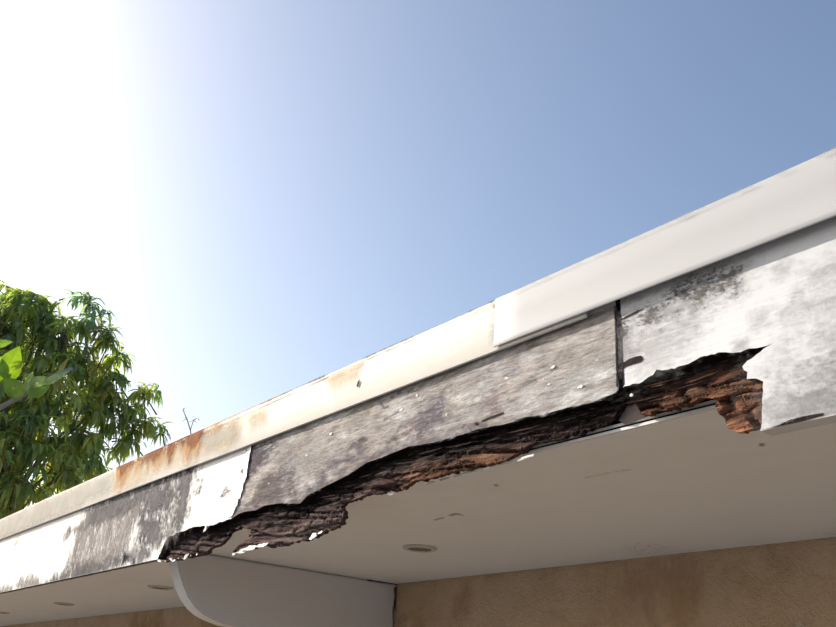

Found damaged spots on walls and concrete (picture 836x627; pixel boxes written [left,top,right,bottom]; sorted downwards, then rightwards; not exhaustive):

leakage [638,265,742,325]
peeling [227,306,618,519]
corrosion [115,422,221,489]
leakage [0,468,202,592]
peeling [232,543,268,556]